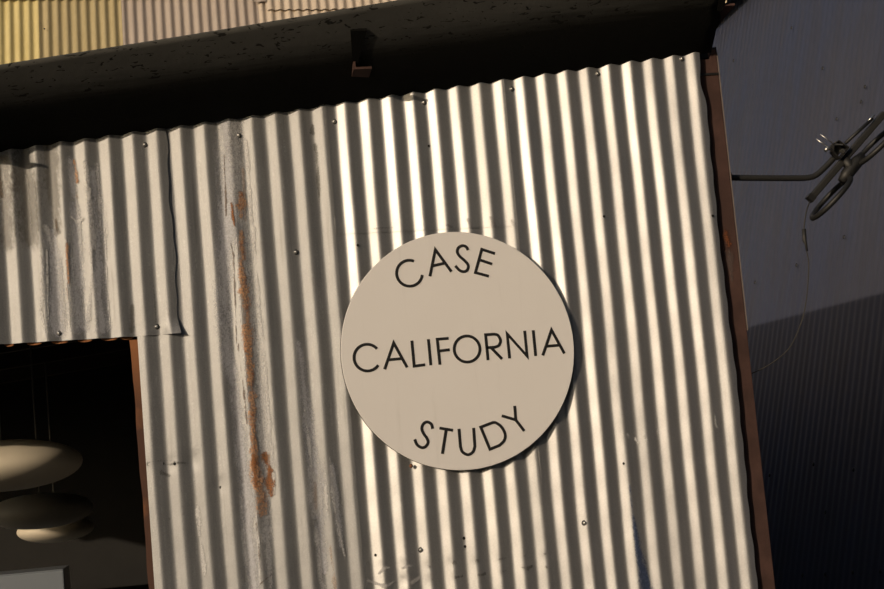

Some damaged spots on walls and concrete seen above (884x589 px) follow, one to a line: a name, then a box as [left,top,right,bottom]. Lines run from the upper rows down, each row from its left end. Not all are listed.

rust [231,192,276,517]